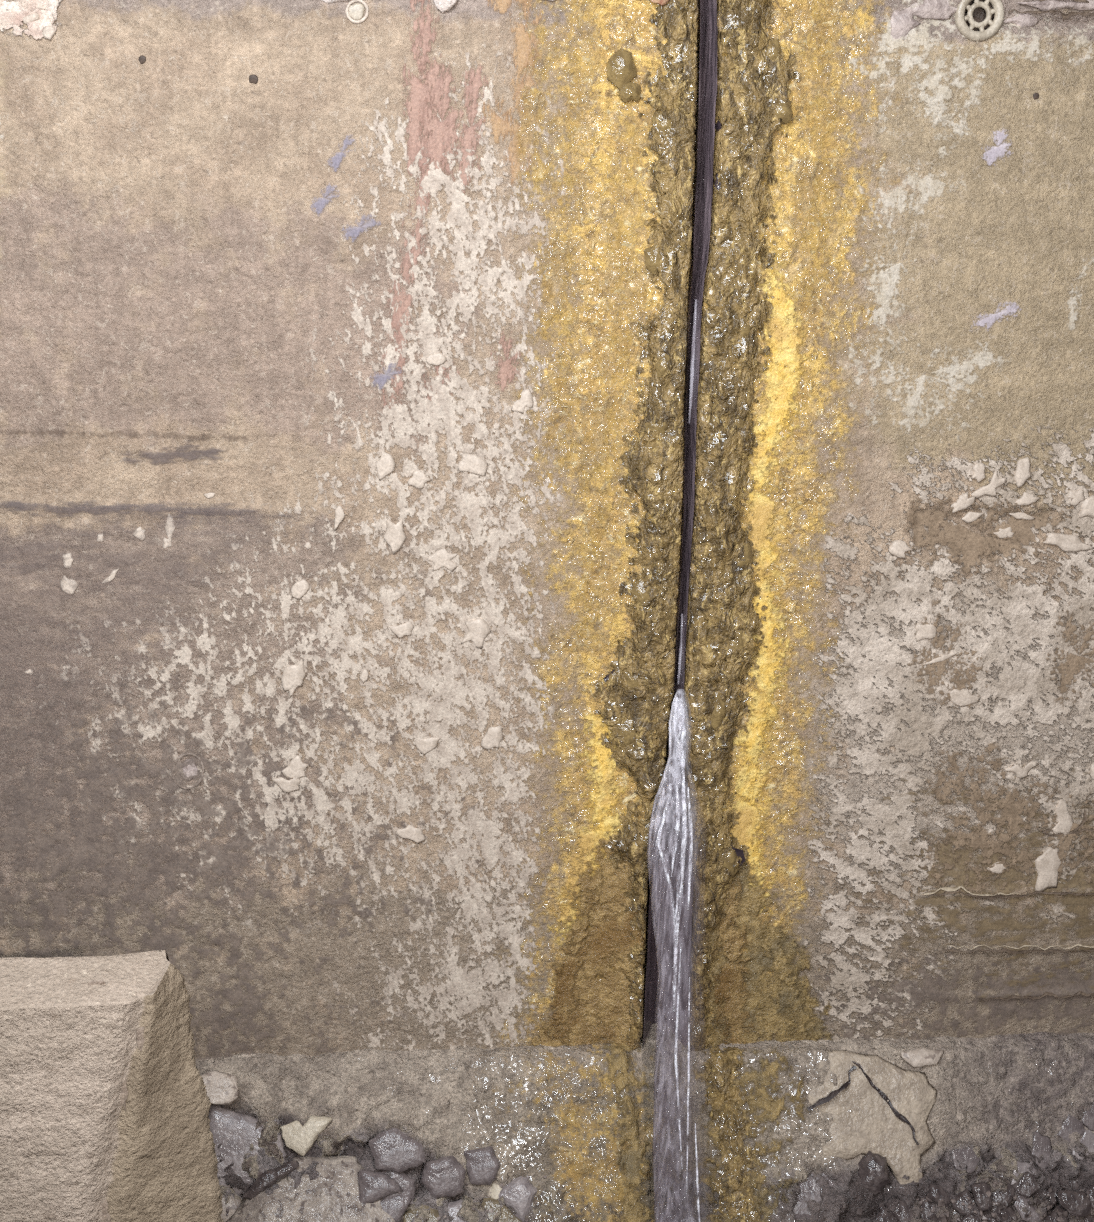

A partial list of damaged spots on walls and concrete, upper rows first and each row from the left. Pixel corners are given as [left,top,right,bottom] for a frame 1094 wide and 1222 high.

crack [1008,0,1094,19]
water stain [846,163,1002,431]
water stain [0,0,846,1221]
peeling [803,426,1094,1041]
water stain [841,780,1094,1041]
crack [807,1061,919,1145]